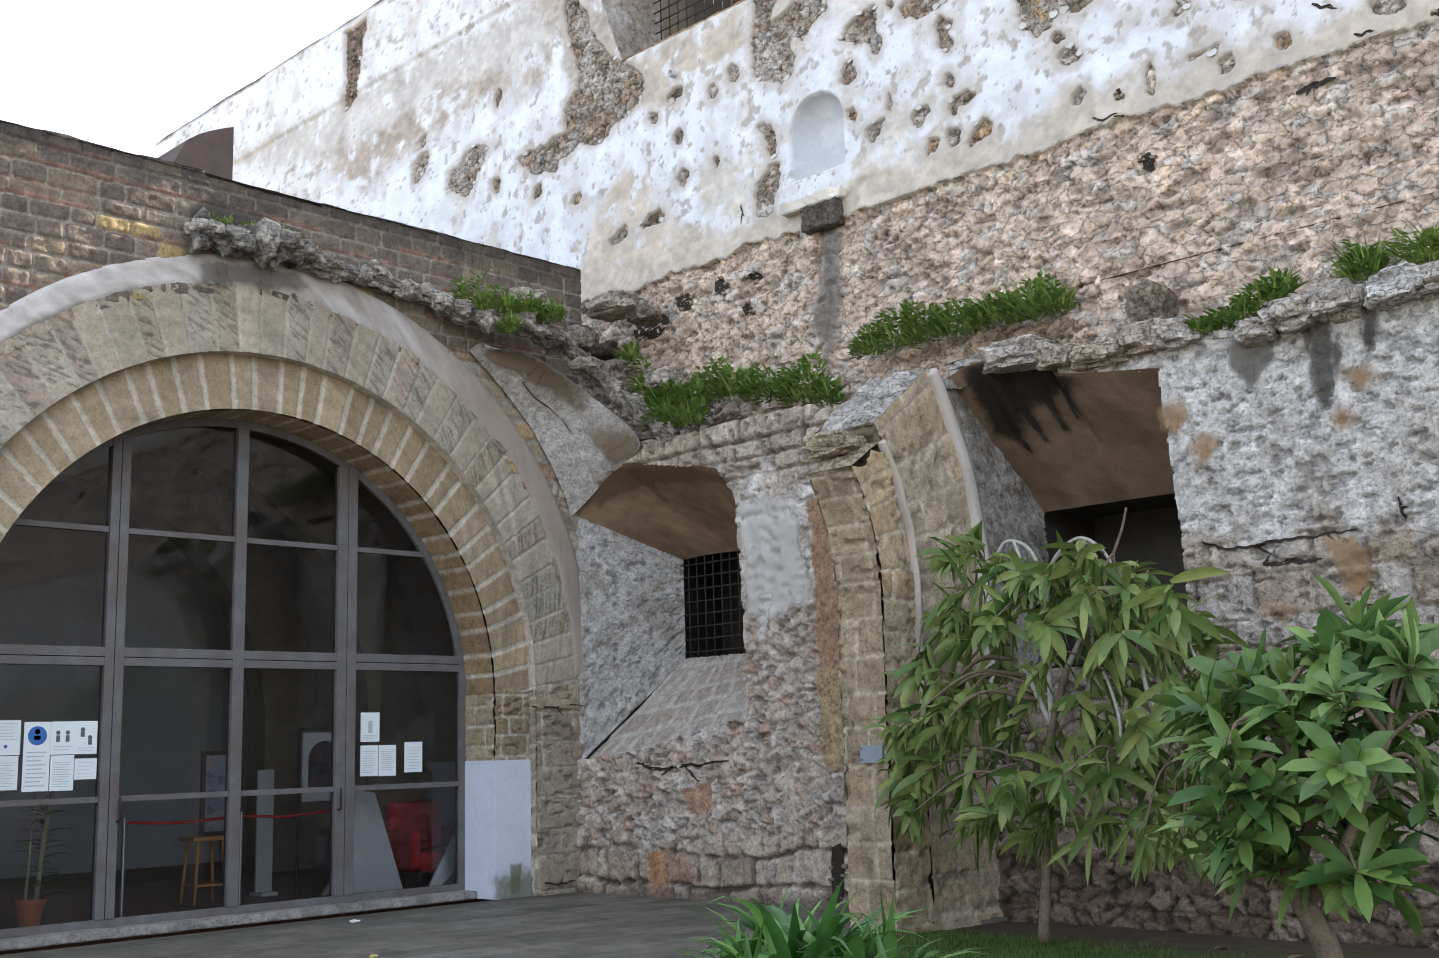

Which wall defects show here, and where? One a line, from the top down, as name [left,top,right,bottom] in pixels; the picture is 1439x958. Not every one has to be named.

flaking render [345,20,367,111]
flaking render [520,0,645,199]
flaking render [650,88,683,124]
flaking render [709,0,828,99]
flaking render [837,0,954,85]
flaking render [1017,0,1093,66]
flaking render [448,145,488,197]
leakage [1229,336,1271,387]
leakage [1304,321,1340,407]
leakage [1363,307,1377,346]
leakage [964,364,1081,453]
crack [637,760,729,781]